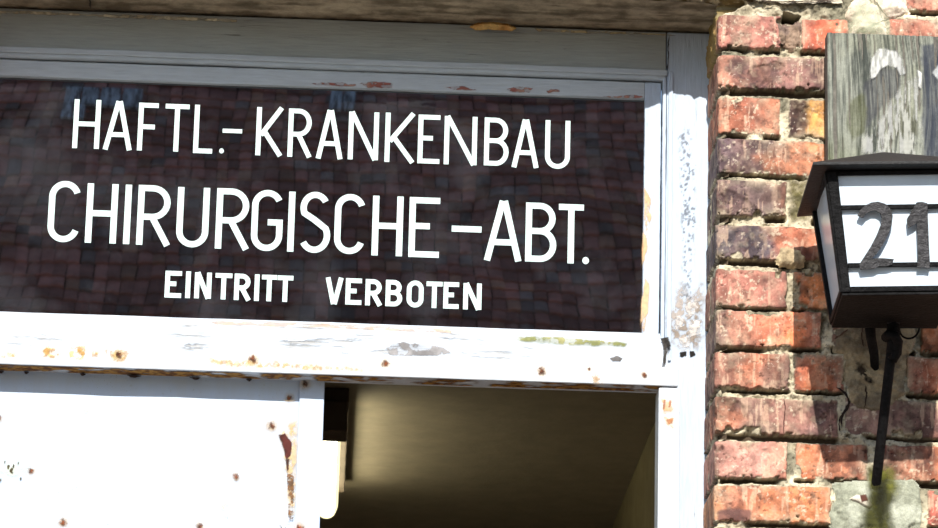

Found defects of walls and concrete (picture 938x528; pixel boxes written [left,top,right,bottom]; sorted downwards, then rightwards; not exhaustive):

peeling [212,321,451,333]
peeling [671,287,702,357]
corrosion [0,346,472,386]
peeling [387,342,450,356]
corrosion [491,368,659,392]
corrosion [270,422,304,528]
leakage [864,466,896,528]